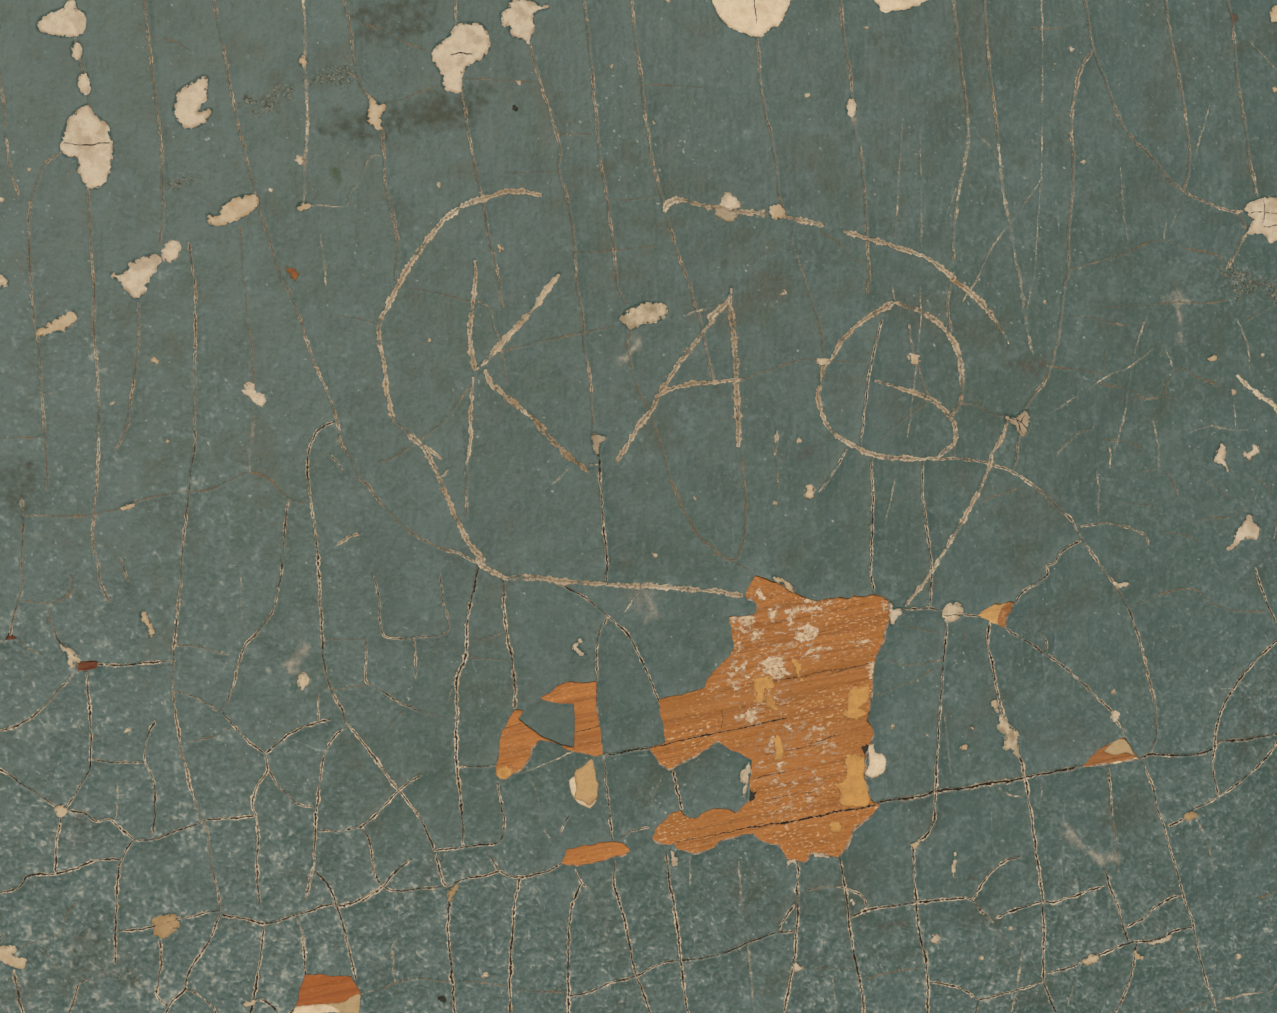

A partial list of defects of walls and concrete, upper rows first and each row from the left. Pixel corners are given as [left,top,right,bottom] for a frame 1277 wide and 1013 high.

peeling [37,0,113,189]
peeling [174,76,212,129]
crack [303,93,311,158]
peeling [431,22,491,94]
crack [631,0,705,189]
peeling [712,0,791,37]
crack [1035,0,1274,295]
crack [0,73,62,487]
crack [520,0,660,701]
crack [819,0,1038,591]
peeling [496,681,603,779]
peeling [649,576,904,867]